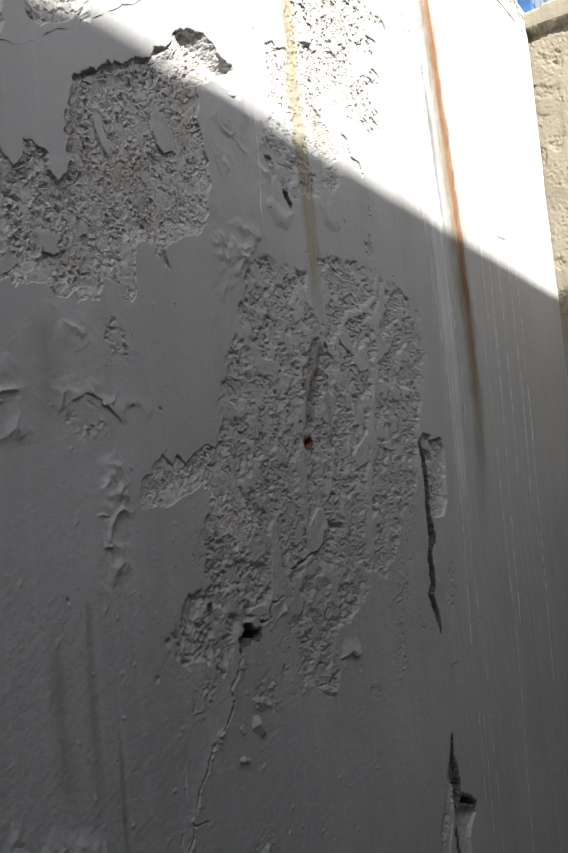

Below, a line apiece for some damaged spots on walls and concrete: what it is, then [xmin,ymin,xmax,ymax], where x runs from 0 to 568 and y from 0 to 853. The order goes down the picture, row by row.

spalling [24,0,84,25]
spalling [0,30,237,302]
spalling [261,0,429,209]
corrosion [421,0,479,410]
spalling [139,240,445,703]
crack [417,440,442,633]
crack [449,733,477,853]